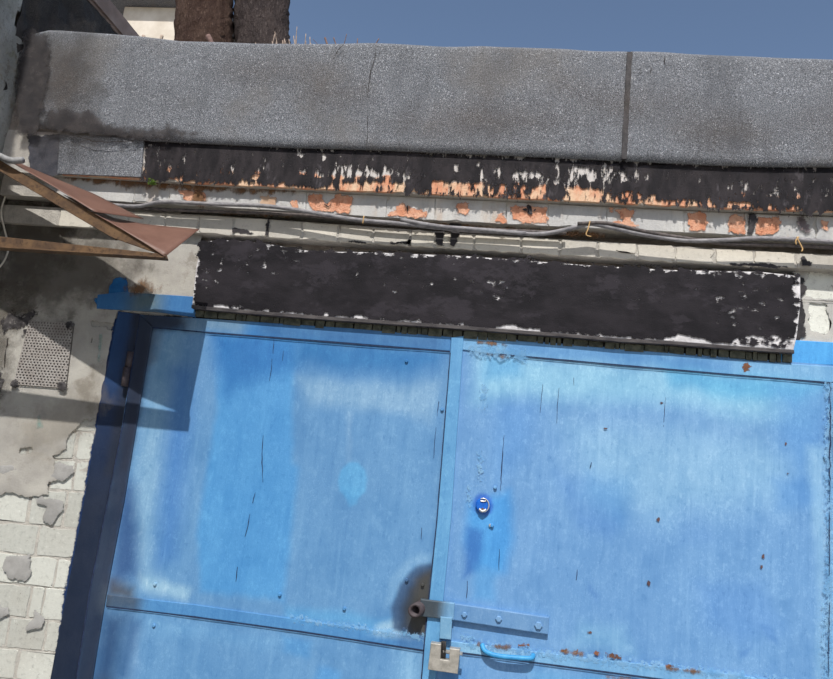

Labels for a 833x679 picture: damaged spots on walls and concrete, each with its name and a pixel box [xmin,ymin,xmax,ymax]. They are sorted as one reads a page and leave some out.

spalling [178,189,206,201]
spalling [260,196,277,205]
spalling [308,193,353,214]
spalling [388,203,428,219]
spalling [495,205,549,224]